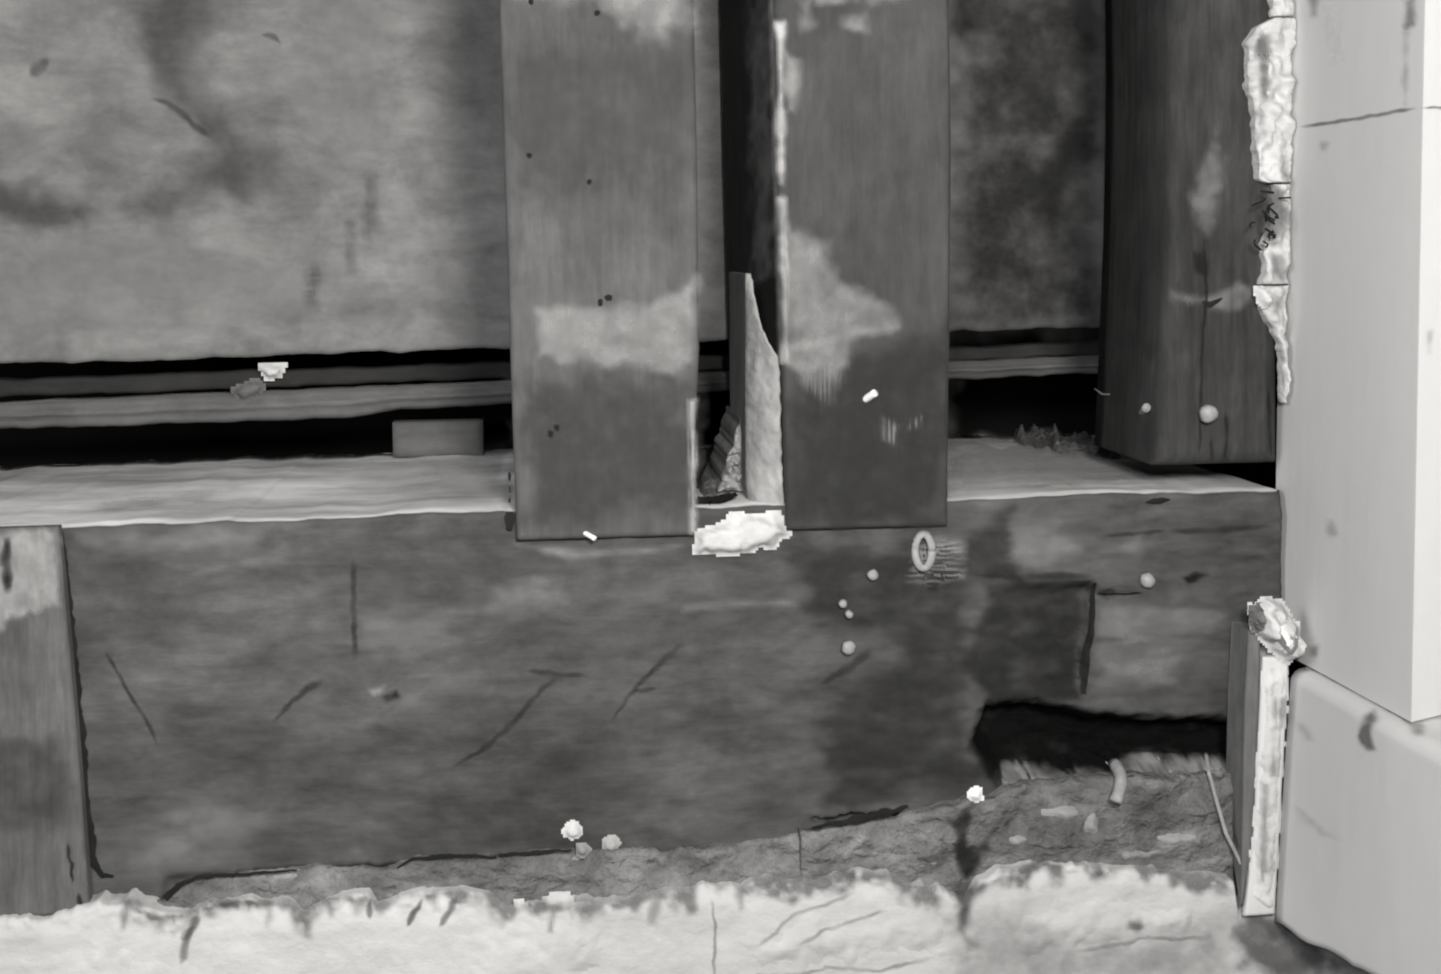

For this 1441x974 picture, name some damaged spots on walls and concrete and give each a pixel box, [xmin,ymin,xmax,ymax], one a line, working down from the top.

flaking render [1242,0,1297,403]
water stain [804,519,1227,803]